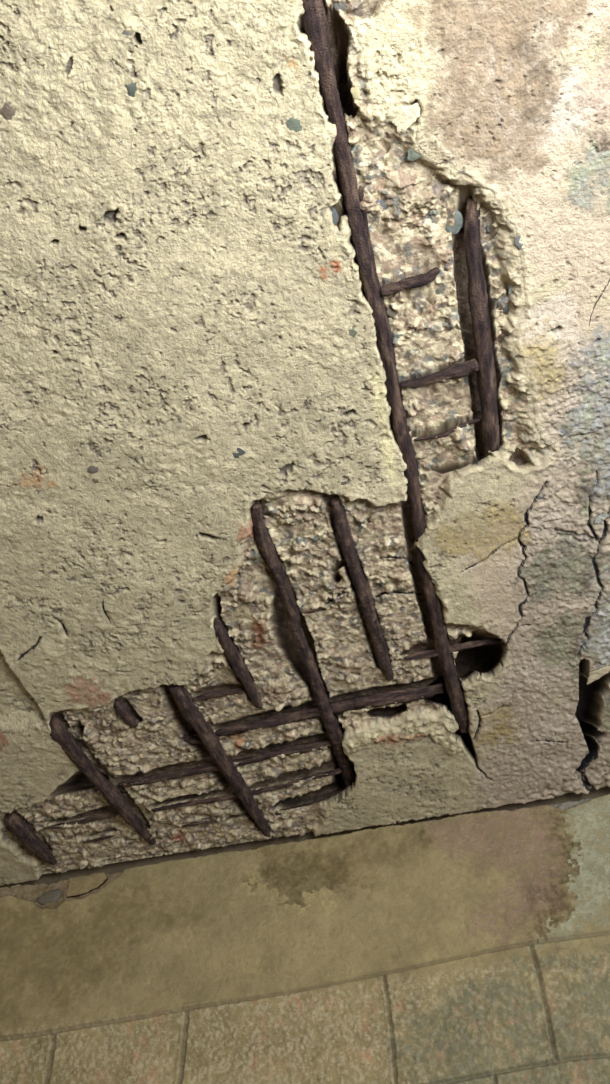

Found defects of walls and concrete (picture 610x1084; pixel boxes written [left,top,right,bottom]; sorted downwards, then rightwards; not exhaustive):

spalling [0,0,553,909]
crack [465,481,546,646]
crack [576,471,610,655]
water stain [421,798,610,938]
peeling [550,797,597,810]